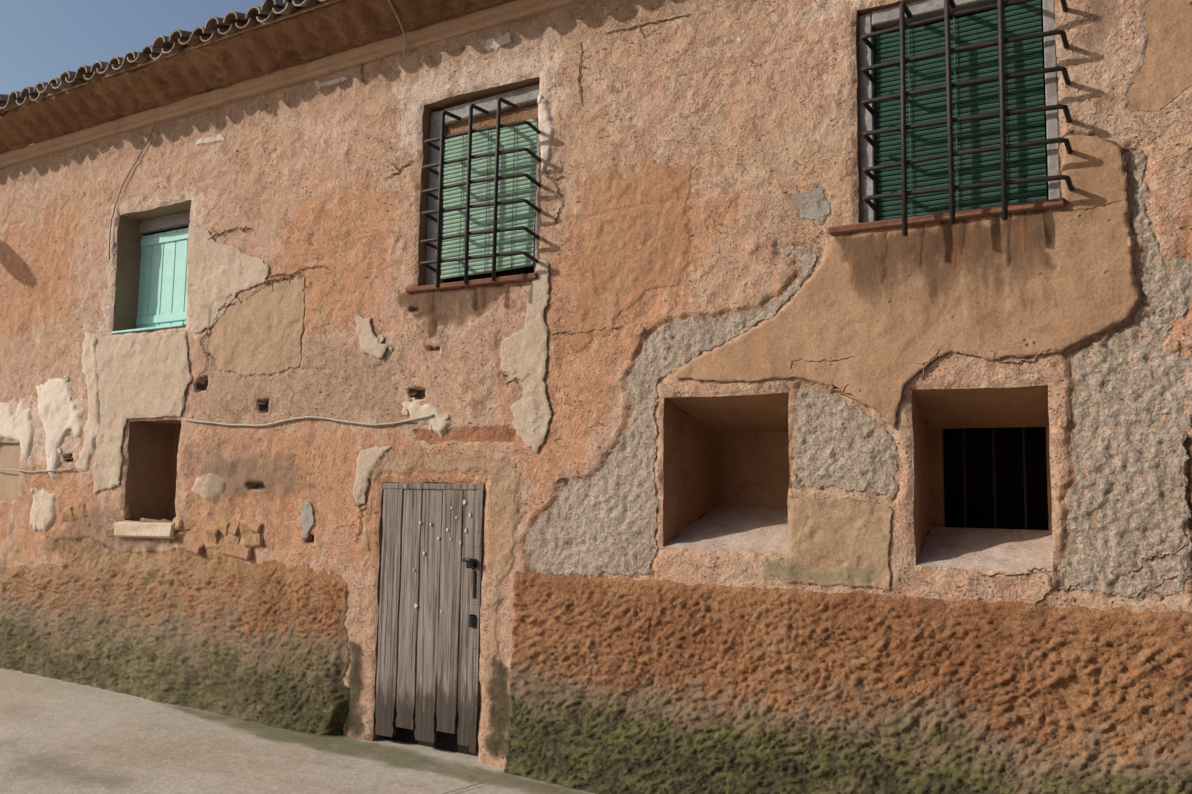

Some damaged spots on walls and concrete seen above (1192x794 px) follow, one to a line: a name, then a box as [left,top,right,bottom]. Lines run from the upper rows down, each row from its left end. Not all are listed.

flaking render [0,332,101,532]
flaking render [355,314,392,358]
flaking render [402,256,552,453]
spalling [526,245,817,577]
leakage [836,209,1051,291]
spalling [1058,148,1192,602]